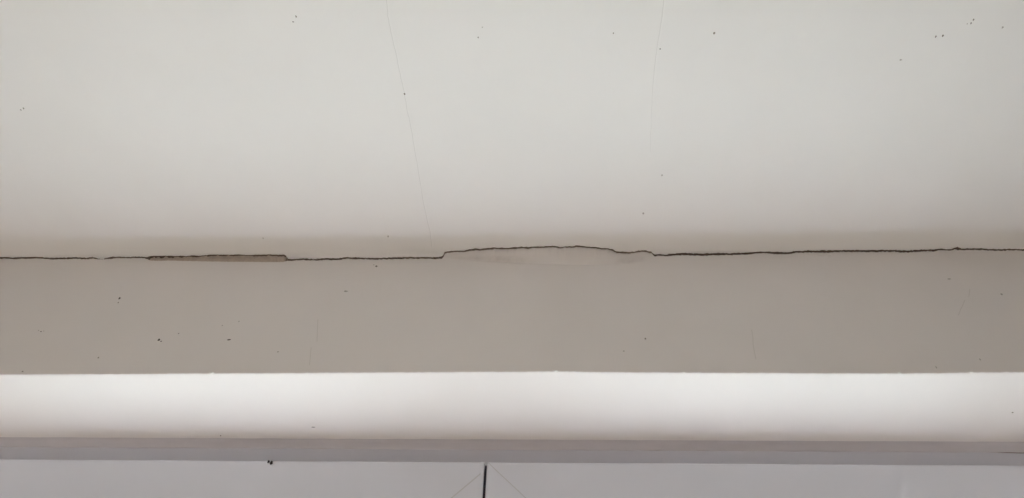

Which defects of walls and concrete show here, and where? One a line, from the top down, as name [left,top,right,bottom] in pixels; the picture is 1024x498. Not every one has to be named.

crack [286,245,1024,261]
crack [0,254,150,262]
spalling [149,254,287,262]